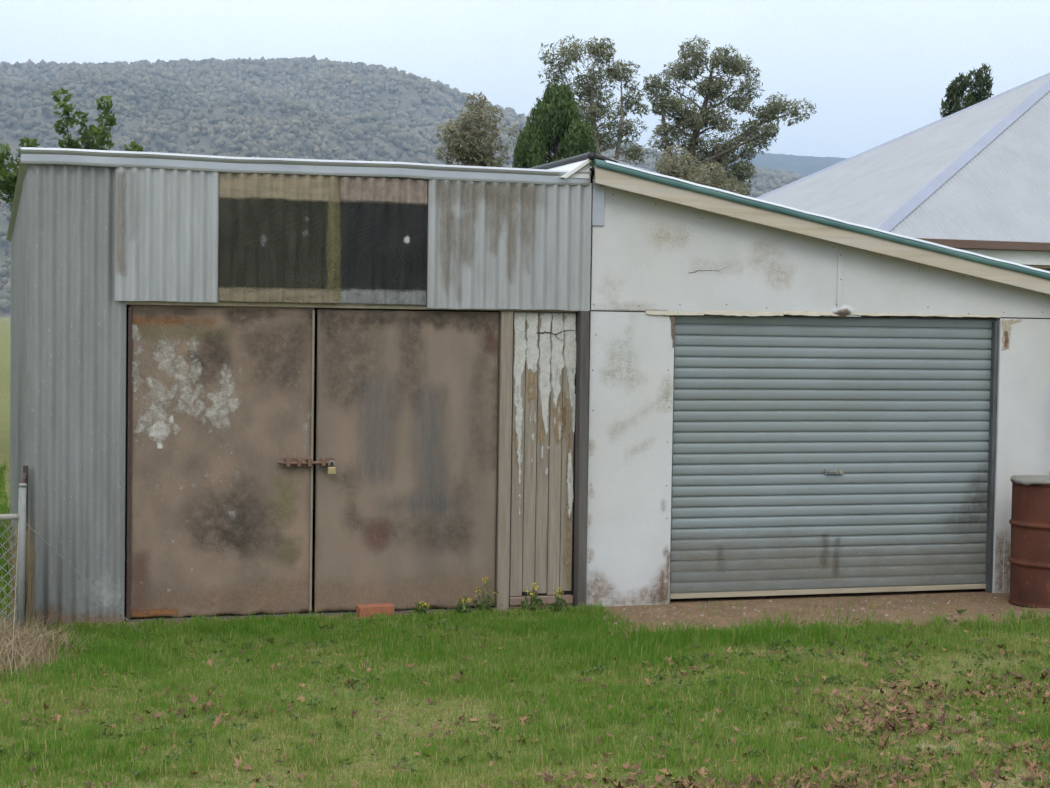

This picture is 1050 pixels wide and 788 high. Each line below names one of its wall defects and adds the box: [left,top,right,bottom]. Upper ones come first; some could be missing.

peeling [132,324,239,449]
peeling [514,313,576,587]